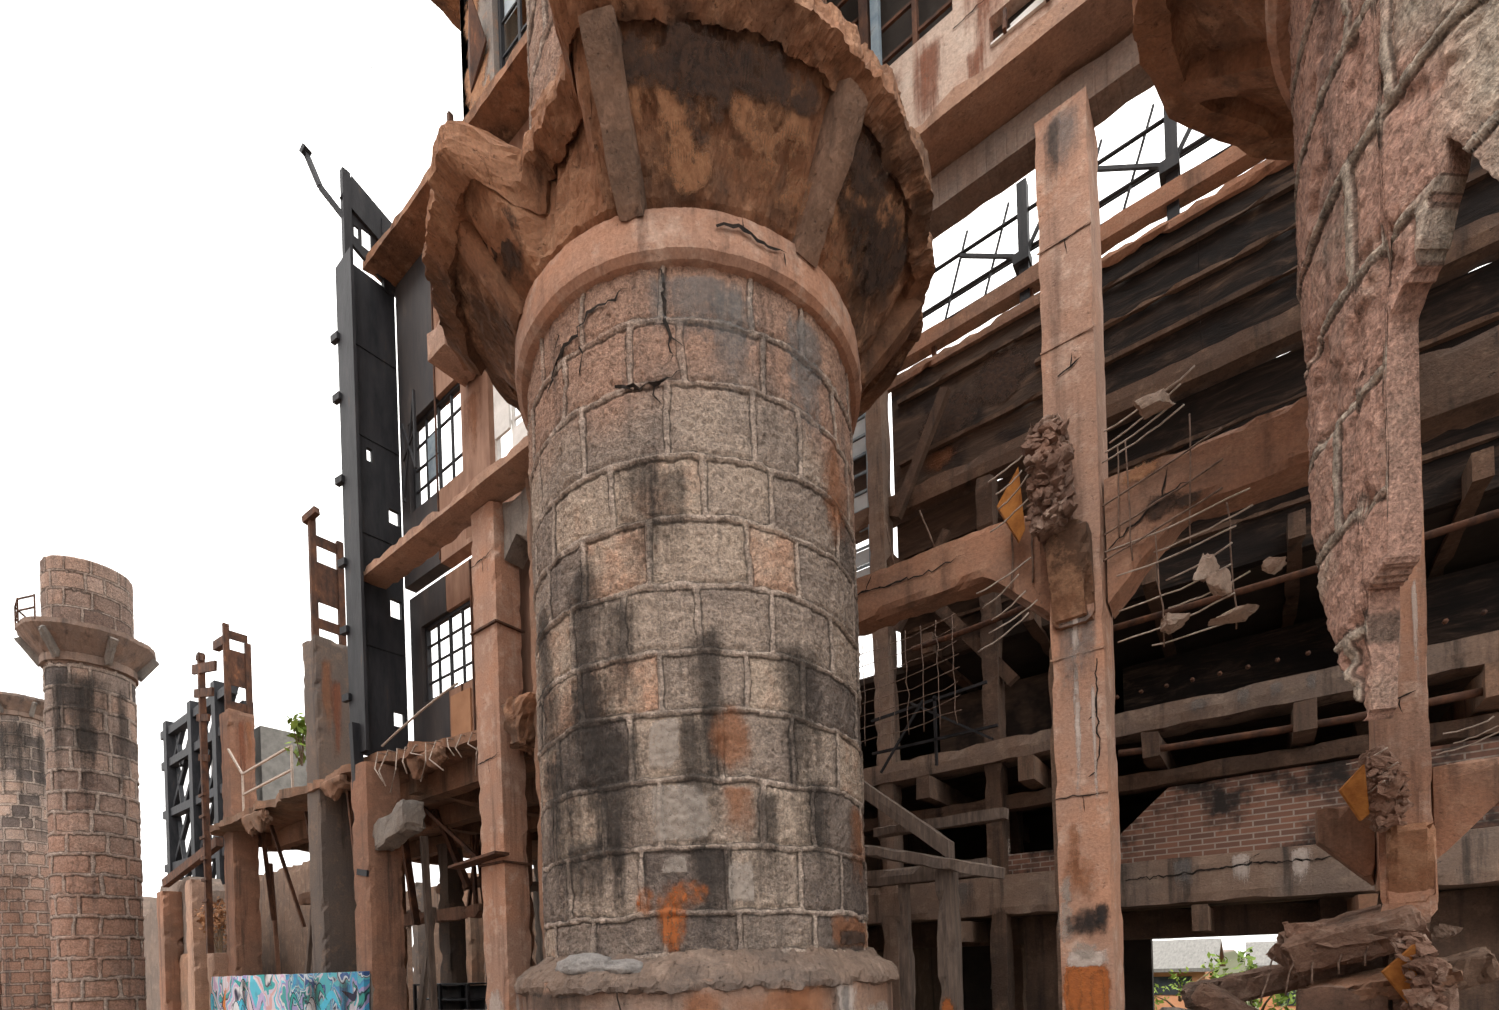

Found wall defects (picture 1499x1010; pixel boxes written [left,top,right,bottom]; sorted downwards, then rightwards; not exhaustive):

crack [716,218,786,265]
water stain [537,570,637,896]
water stain [781,650,818,781]
water stain [680,633,731,908]
water stain [760,794,776,853]
water stain [808,784,825,857]
rust [636,883,707,951]
rust [1063,965,1111,1010]